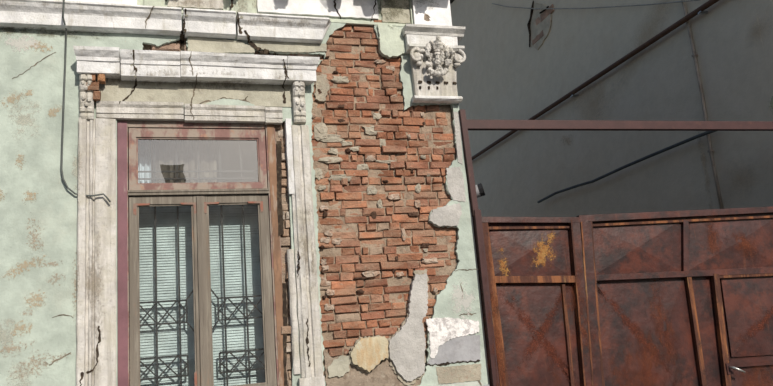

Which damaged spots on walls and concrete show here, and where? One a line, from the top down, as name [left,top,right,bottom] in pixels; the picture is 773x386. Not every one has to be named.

crack [119,50,137,104]
crack [176,9,250,120]
crack [230,0,289,104]
flaking render [255,20,482,386]
peeling [3,218,80,321]
peeling [0,290,68,378]
crack [79,326,101,386]